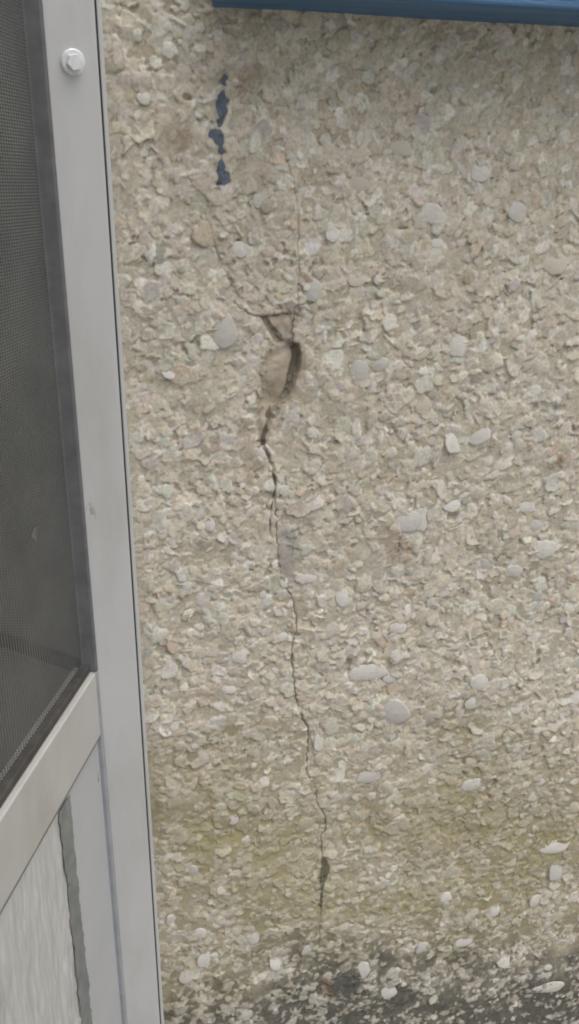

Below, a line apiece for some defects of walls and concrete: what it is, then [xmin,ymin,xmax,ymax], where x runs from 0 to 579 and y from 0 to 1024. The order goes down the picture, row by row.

flaking render [258,315,305,436]
crack [260,405,326,851]